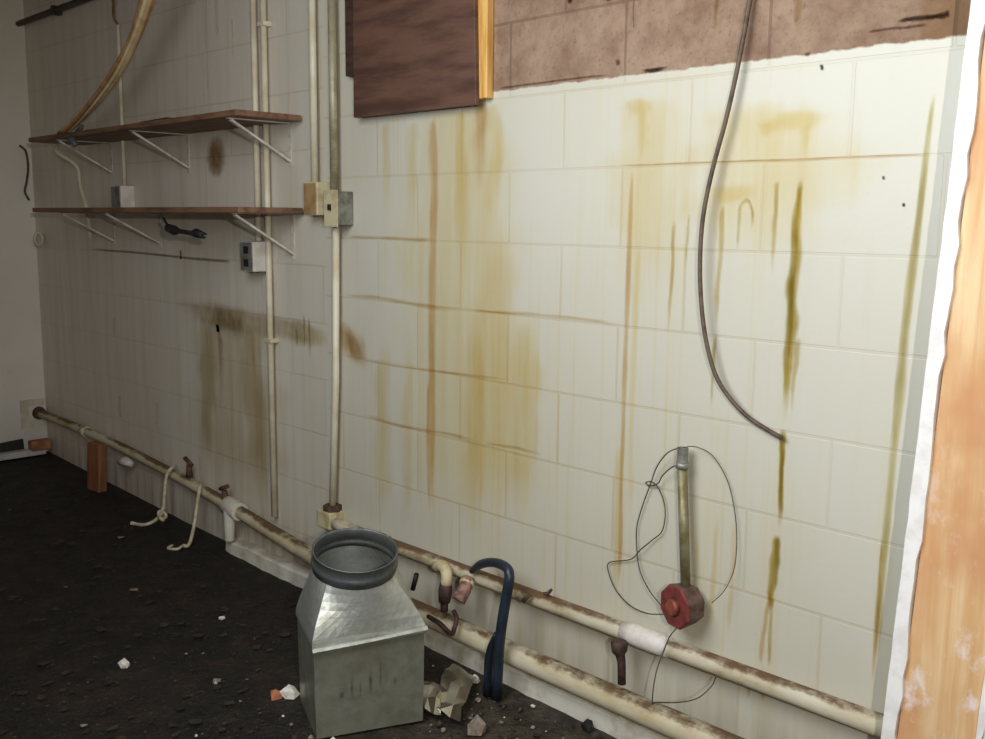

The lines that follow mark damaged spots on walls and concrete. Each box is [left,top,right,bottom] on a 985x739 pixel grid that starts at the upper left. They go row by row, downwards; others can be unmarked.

spalling [902,12,948,21]